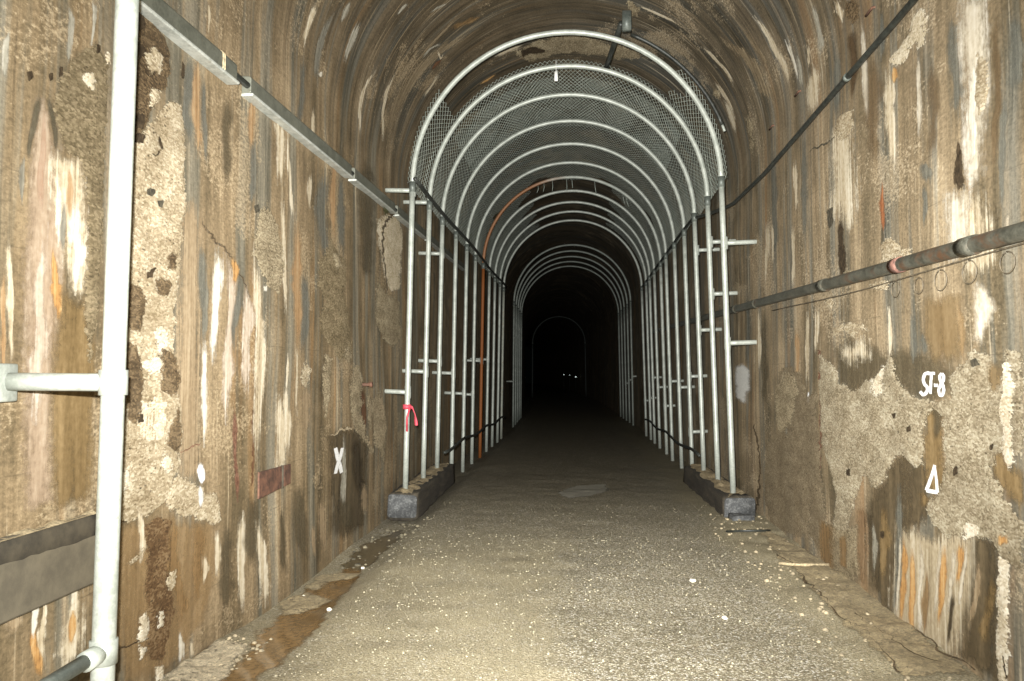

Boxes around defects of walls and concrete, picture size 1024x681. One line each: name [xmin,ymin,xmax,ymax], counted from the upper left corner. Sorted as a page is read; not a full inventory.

spalling [49,44,111,363]
spalling [121,12,188,524]
damp [179,635,194,660]
damp [202,503,269,603]
damp [280,492,326,567]
spalling [321,347,388,538]
spalling [818,348,1024,571]